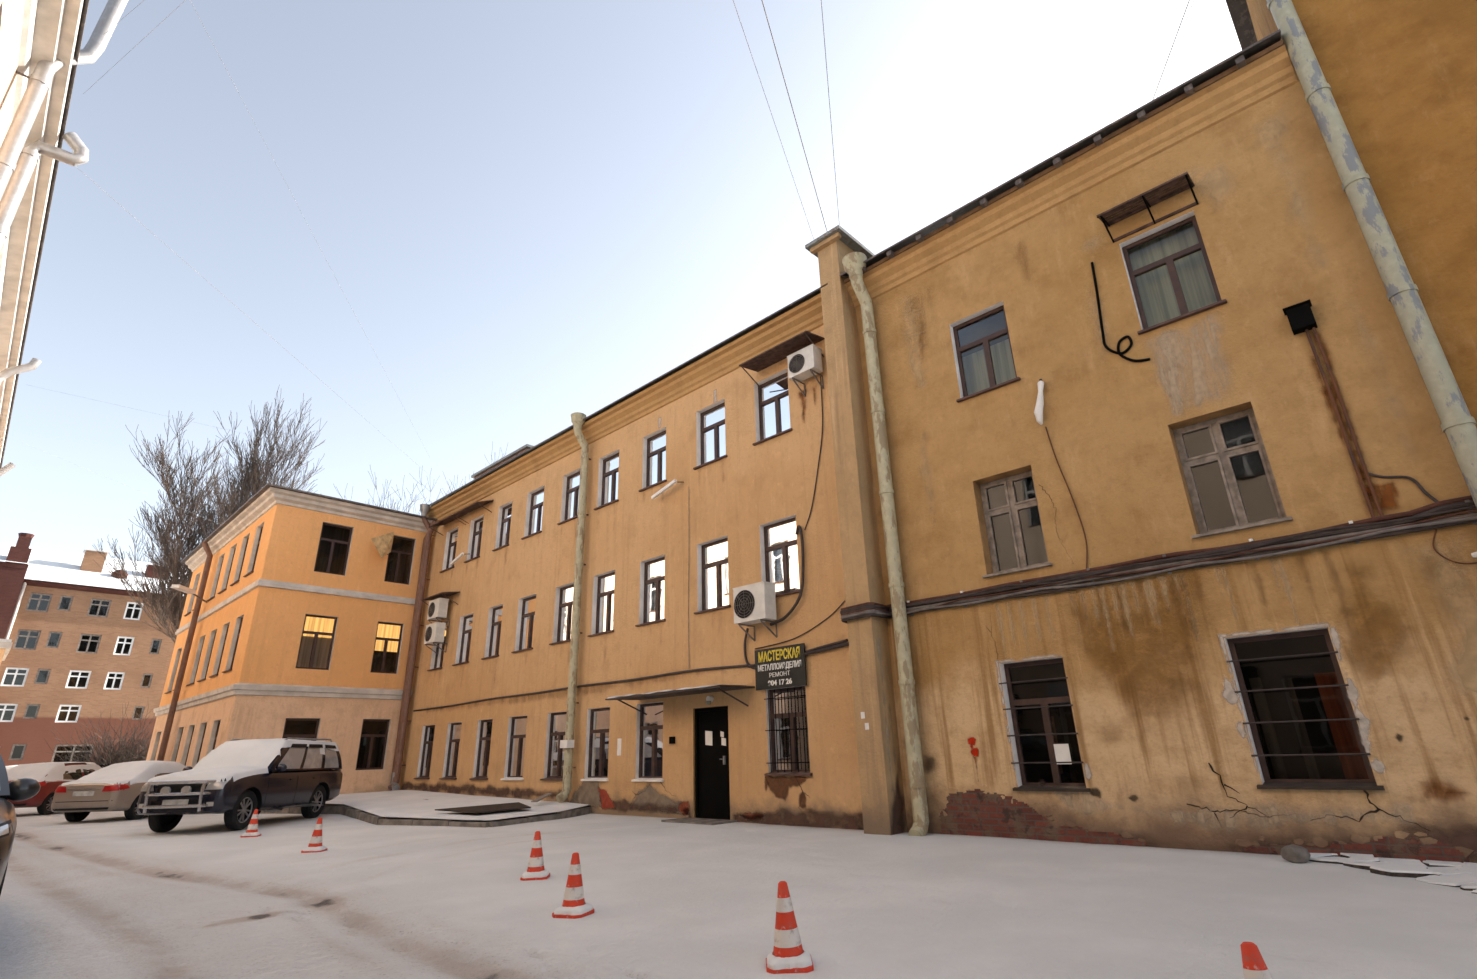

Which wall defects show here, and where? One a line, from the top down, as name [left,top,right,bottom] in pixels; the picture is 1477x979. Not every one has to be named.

rust [1313,334,1398,510]
peeling [995,655,1056,704]
water stain [1087,582,1193,707]
peeling [1218,623,1341,770]
peeling [1347,678,1385,773]
water stain [1351,573,1400,674]
flaking render [939,764,1147,847]
crack [1187,763,1431,832]